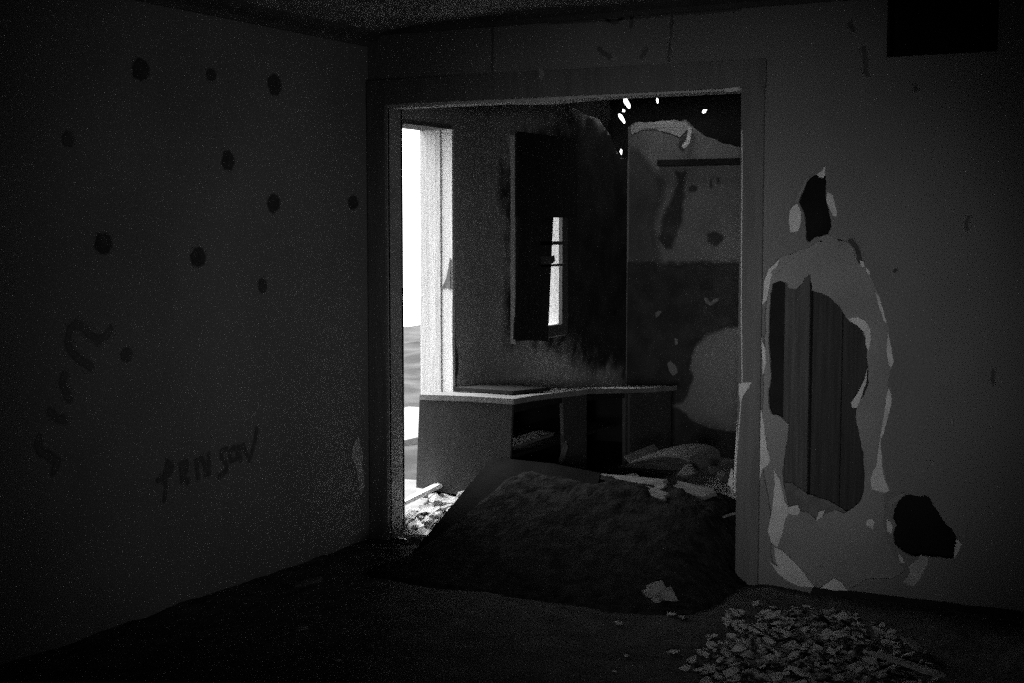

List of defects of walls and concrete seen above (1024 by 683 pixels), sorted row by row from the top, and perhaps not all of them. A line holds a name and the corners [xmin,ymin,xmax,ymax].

peeling [631,120,692,149]
spalling [728,130,961,591]